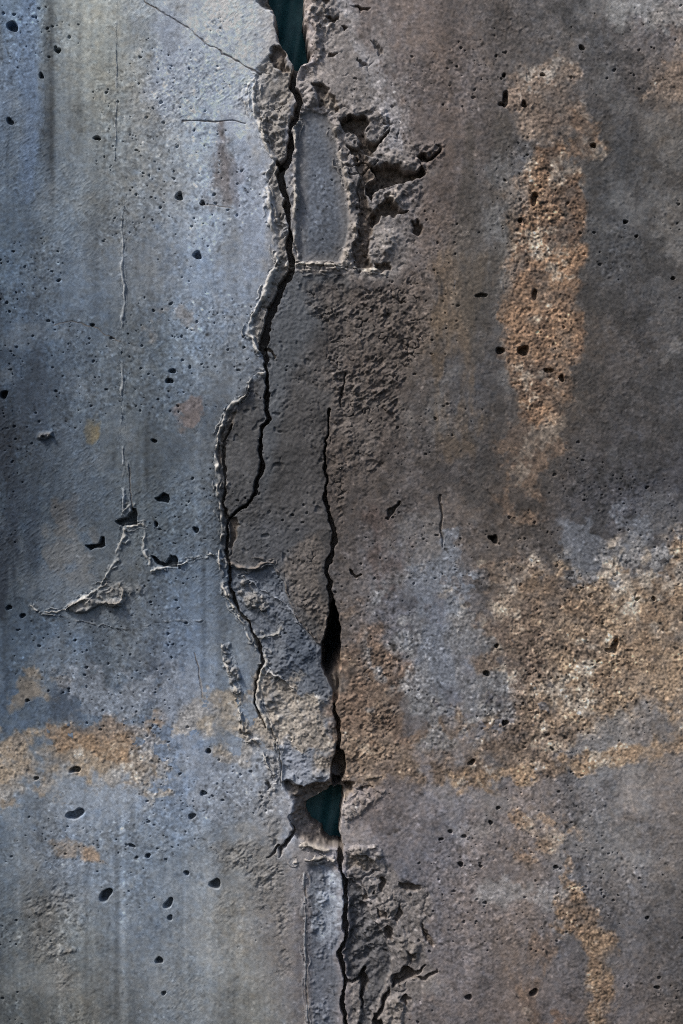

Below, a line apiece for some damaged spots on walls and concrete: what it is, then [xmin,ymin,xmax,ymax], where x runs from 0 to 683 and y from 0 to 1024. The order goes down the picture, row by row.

crack [182,118,247,126]
crack [222,69,303,611]
corrosion [425,49,613,528]
corrosion [0,664,175,815]
crack [254,642,279,745]
spalling [199,0,446,1024]
crack [321,373,362,786]
crack [386,501,401,521]
corrosion [336,517,683,799]
crack [267,844,281,859]
crack [337,843,367,1024]